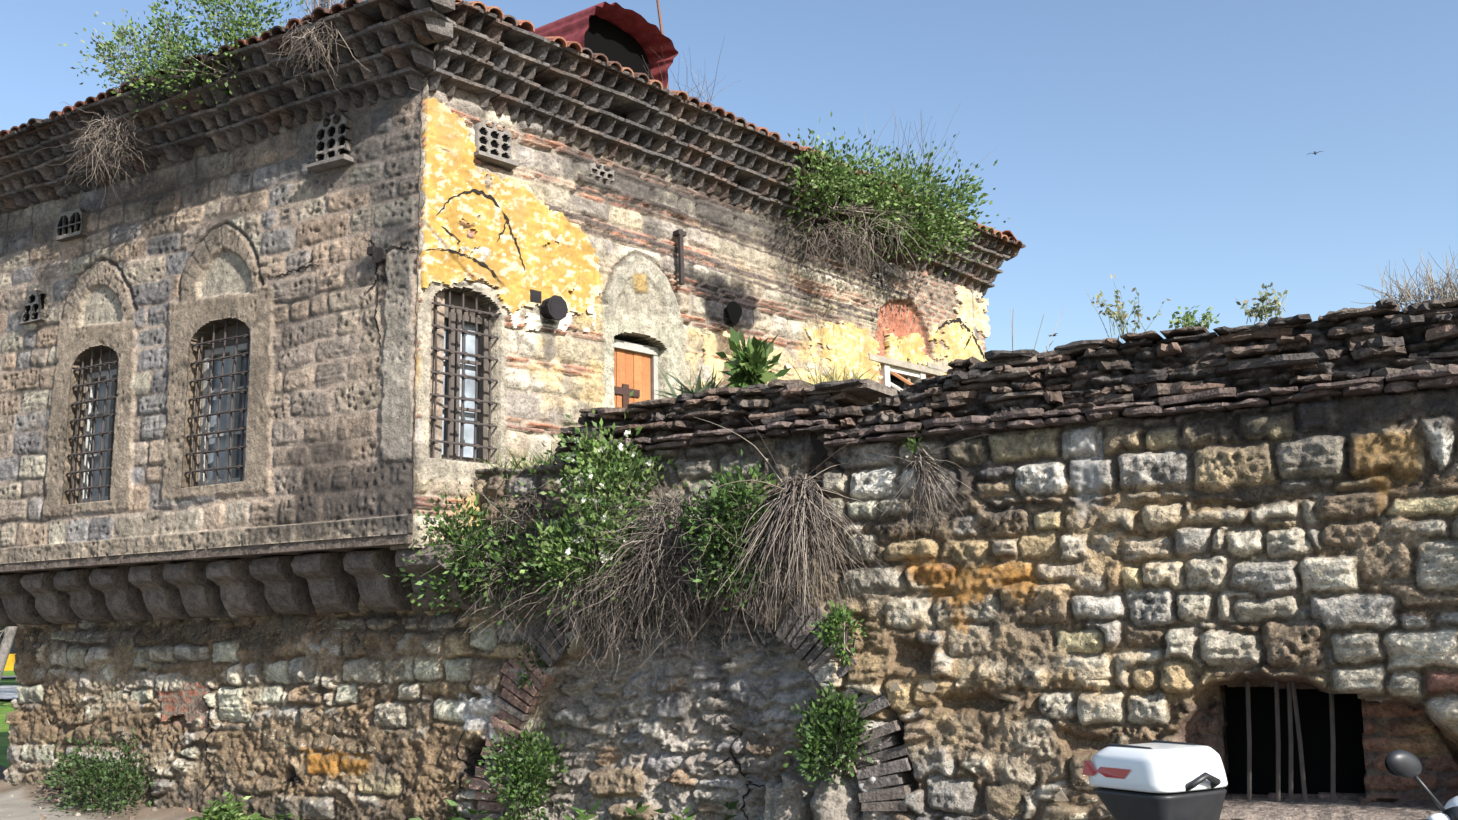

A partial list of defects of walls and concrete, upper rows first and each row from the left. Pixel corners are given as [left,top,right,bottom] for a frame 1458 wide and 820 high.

crack [363,189,525,356]
peeling [419,97,603,339]
peeling [685,328,747,387]
peeling [767,285,990,384]